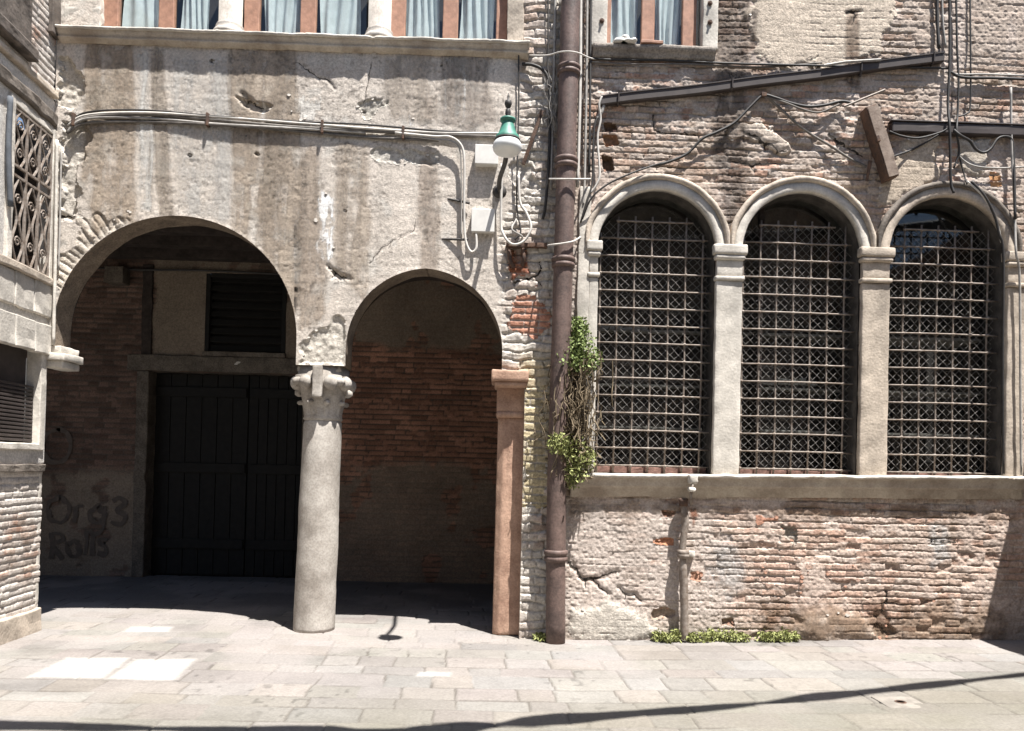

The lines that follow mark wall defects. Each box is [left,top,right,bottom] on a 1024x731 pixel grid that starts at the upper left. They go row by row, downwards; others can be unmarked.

flaking render [55,56,135,295]
damp [82,44,199,235]
damp [185,49,325,328]
damp [336,143,370,296]
flaking render [298,315,347,366]
flaking render [507,262,552,339]
crack [568,561,641,601]